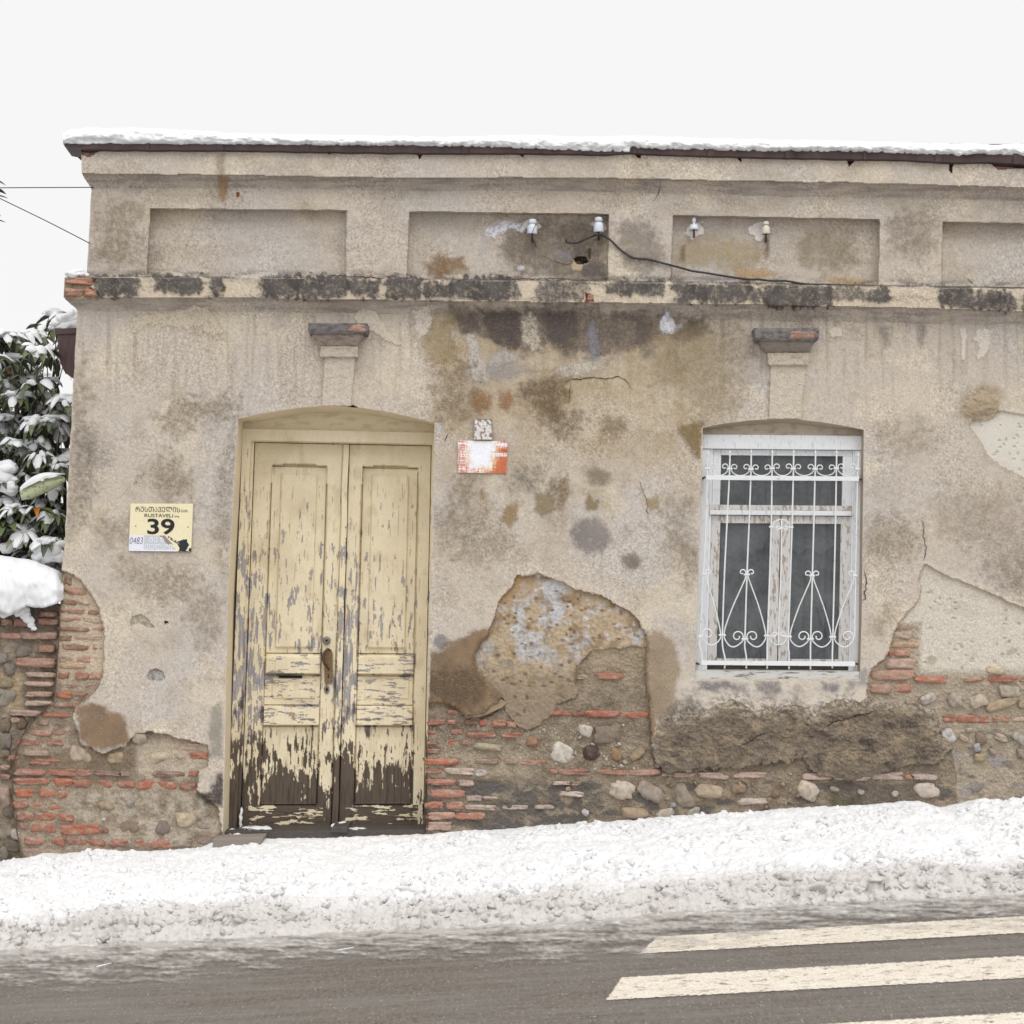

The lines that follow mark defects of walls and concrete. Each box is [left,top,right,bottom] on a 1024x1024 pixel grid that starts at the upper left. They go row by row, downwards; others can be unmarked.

damp [520,377,582,439]
damp [426,303,754,420]
crack [567,375,631,403]
spalling [970,412,1024,477]
damp [513,469,569,516]
damp [441,504,517,557]
spalling [11,572,223,858]
spalling [424,565,1024,834]